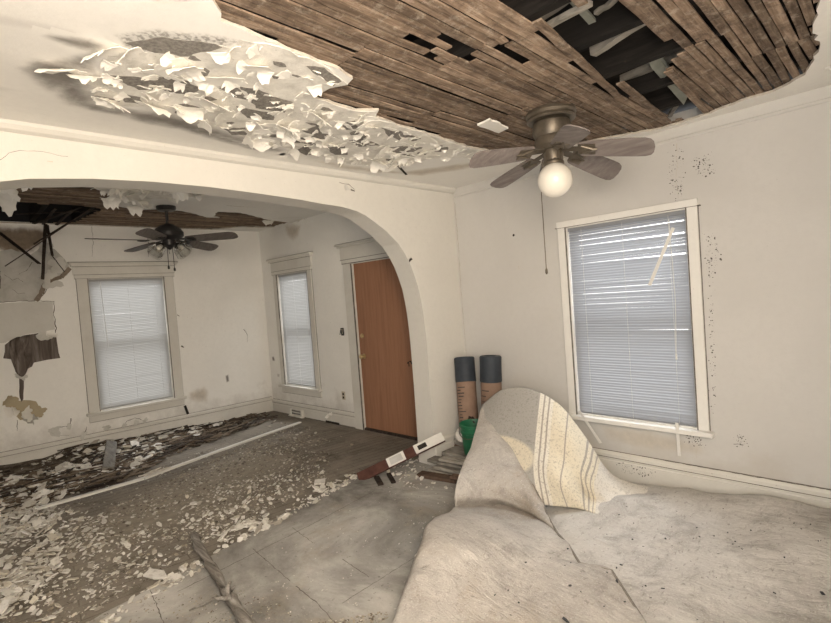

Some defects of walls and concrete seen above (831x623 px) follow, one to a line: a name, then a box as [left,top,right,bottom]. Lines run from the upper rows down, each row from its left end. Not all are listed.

damp [0,10,491,178]
flaking render [34,0,820,175]
flaking render [0,187,288,429]